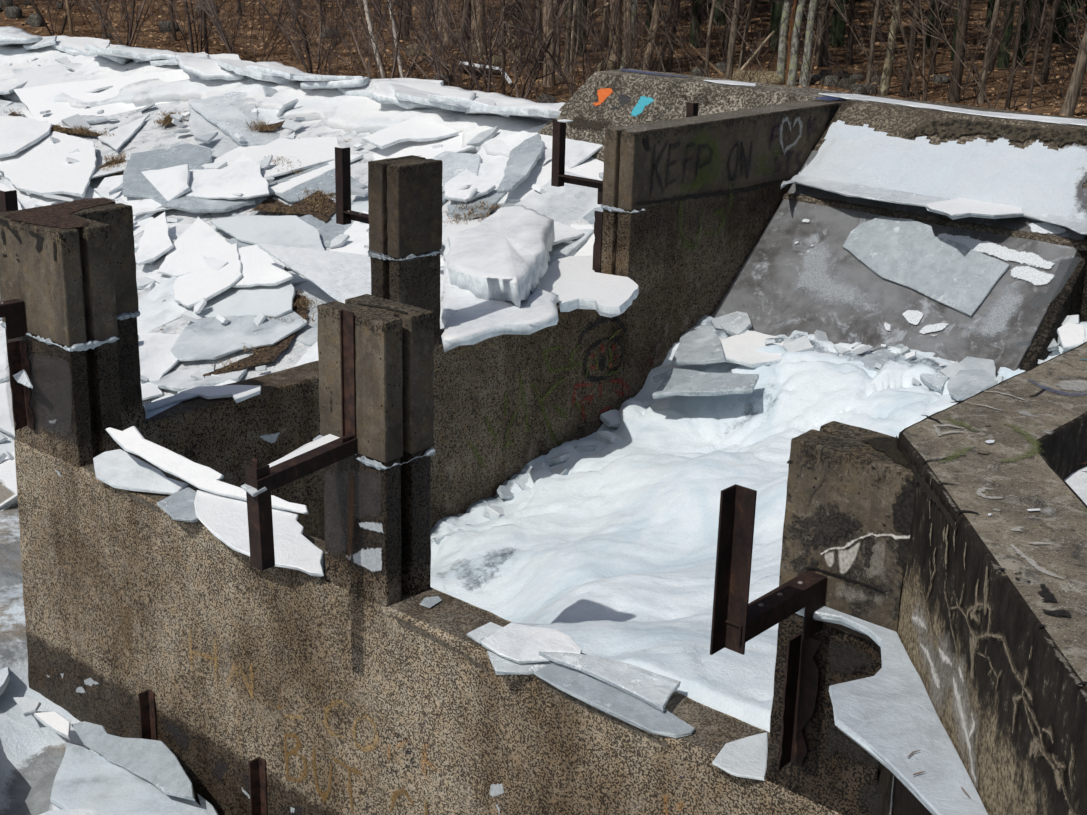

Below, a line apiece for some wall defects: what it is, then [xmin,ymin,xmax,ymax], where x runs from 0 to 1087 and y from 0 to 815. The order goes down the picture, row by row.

crack [805,533,910,593]